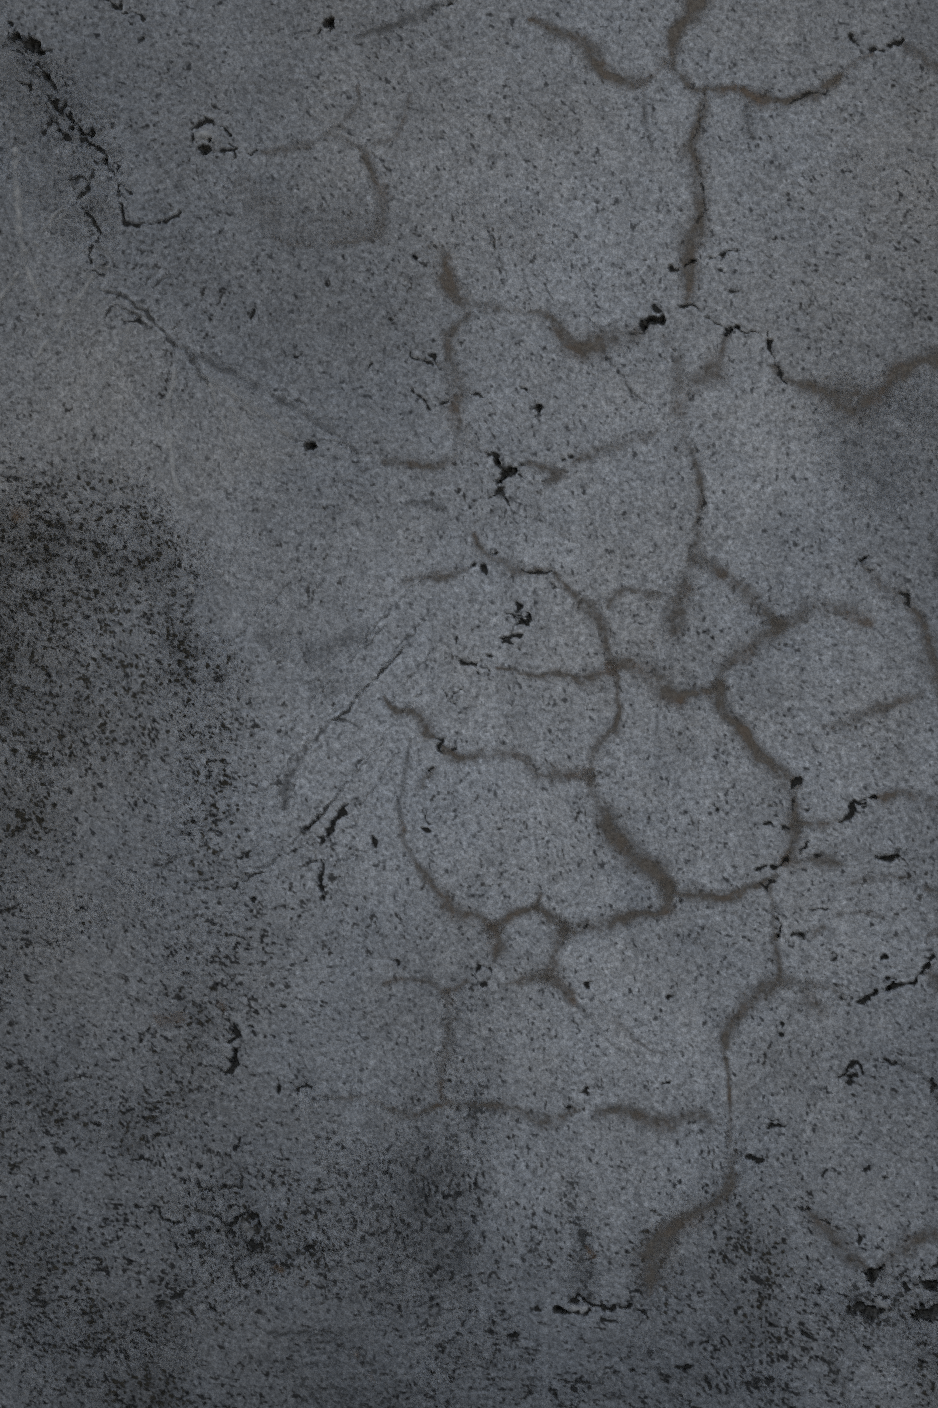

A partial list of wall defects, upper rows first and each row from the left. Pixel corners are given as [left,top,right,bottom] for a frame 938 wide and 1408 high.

crack [528,19,645,117]
crack [668,0,938,415]
crack [105,291,208,384]
crack [438,257,461,360]
crack [545,314,644,357]
crack [530,455,587,481]
crack [899,592,938,680]
crack [383,696,478,762]
crack [402,460,912,1004]
crack [815,954,938,1005]
crack [483,935,784,1129]
crack [800,1207,885,1285]